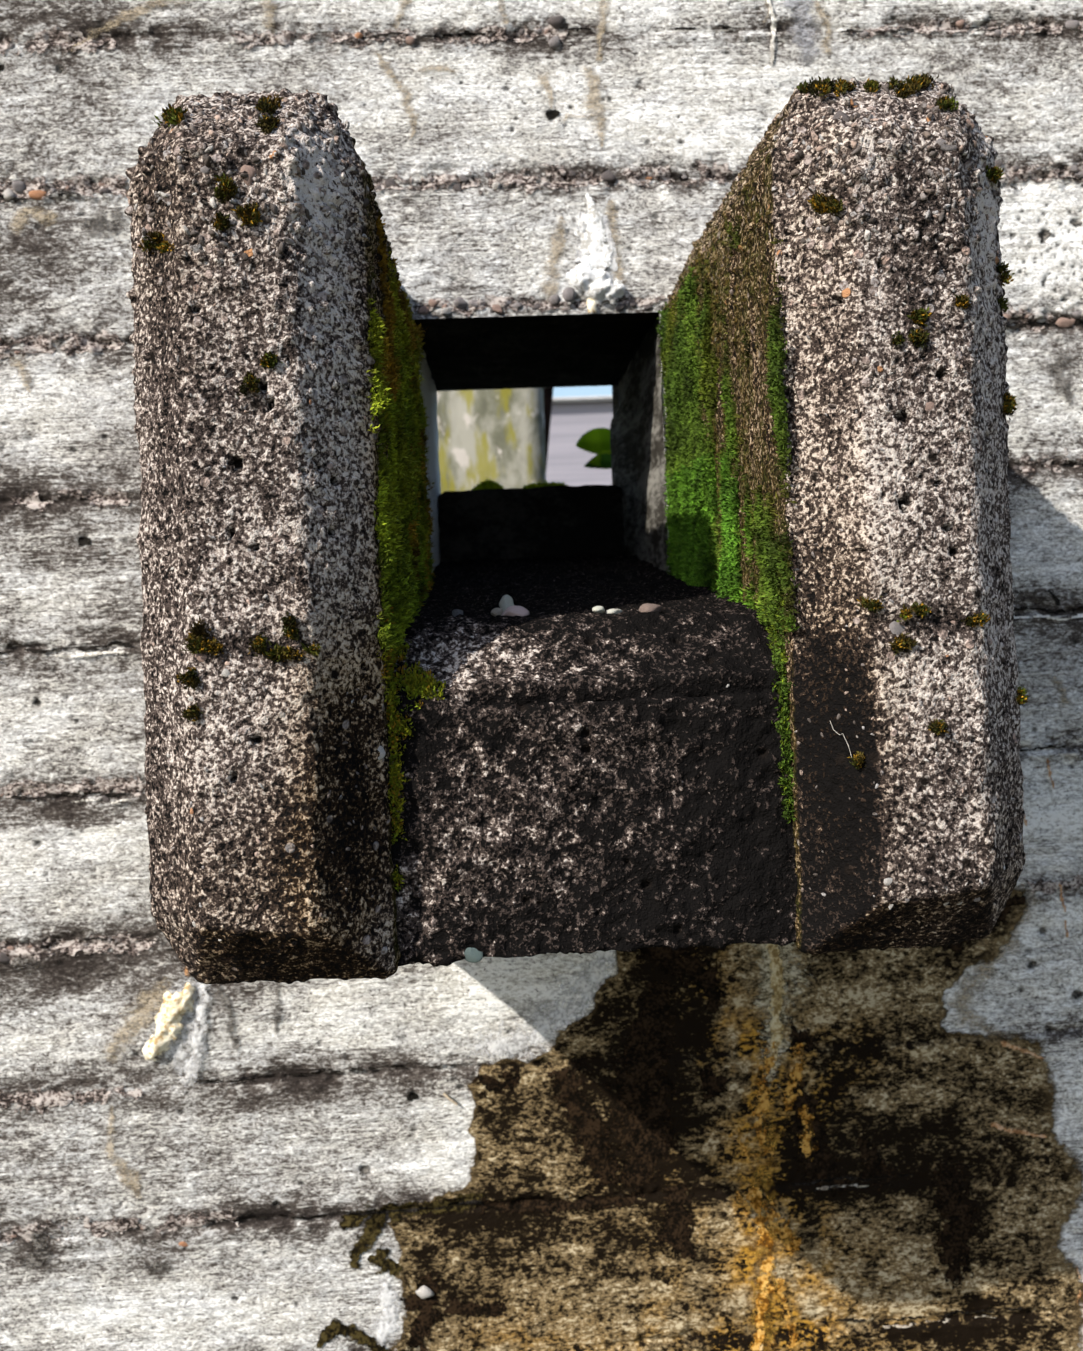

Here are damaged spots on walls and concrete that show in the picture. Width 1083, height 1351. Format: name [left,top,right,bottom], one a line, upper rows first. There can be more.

water stain [542,193,625,313]
water stain [107,968,239,1084]
water stain [316,888,1083,1351]
corrosion [729,1041,818,1163]
corrosion [735,1186,802,1351]